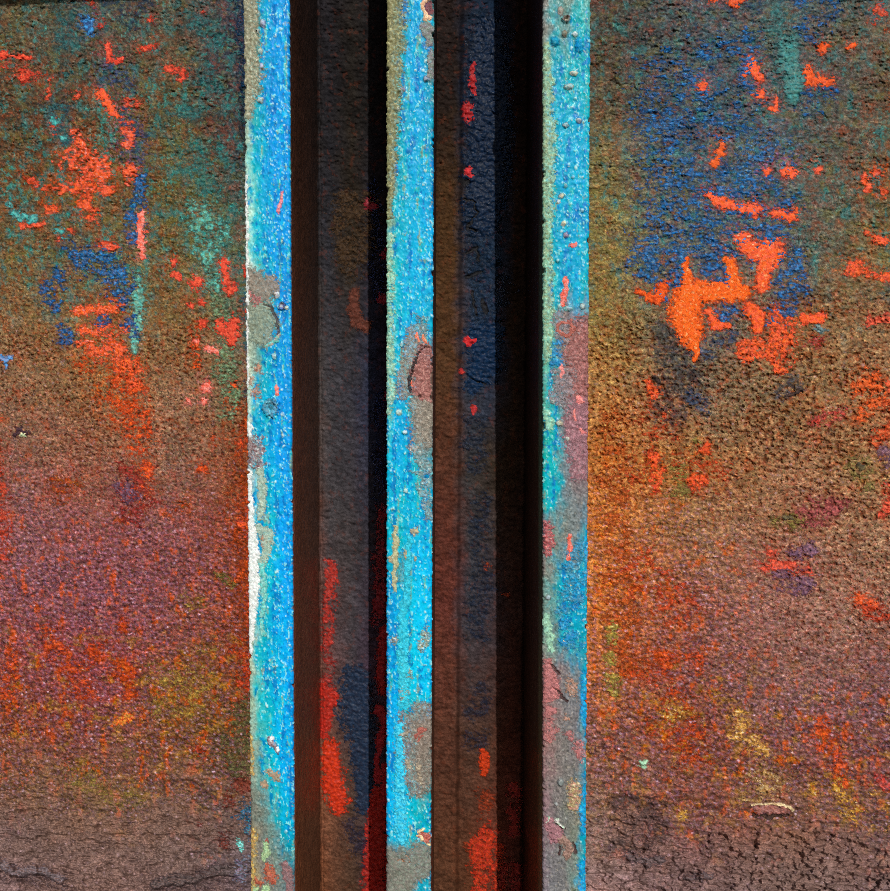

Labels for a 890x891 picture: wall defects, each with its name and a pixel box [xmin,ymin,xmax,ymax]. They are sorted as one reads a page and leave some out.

peeling [363,0,411,220]
peeling [453,11,522,245]
peeling [170,175,285,424]
peeling [458,319,506,415]
peeling [319,233,433,891]
peeling [542,783,587,891]
peeling [751,802,795,820]